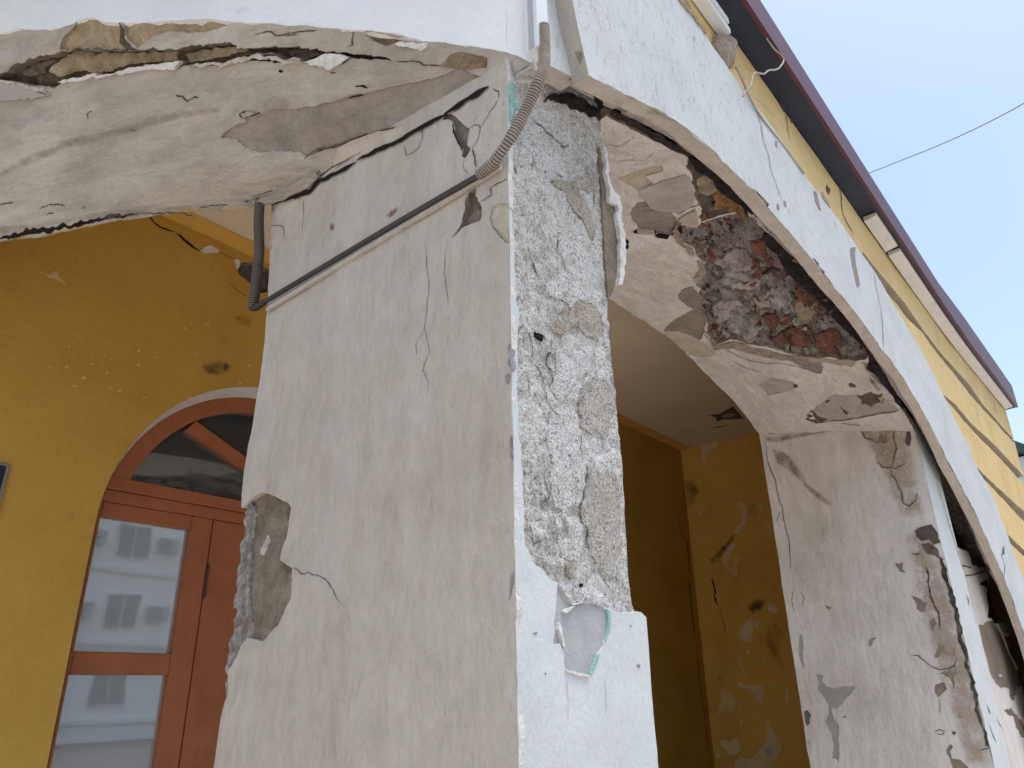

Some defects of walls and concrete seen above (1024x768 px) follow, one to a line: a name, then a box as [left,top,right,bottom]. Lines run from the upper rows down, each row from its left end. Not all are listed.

flaking render [59,20,227,51]
flaking render [363,32,429,51]
crack [0,86,489,259]
crack [416,242,448,384]
flaking render [505,66,869,691]
flaking render [806,383,917,507]
flaking render [225,493,271,700]
flaking render [895,524,941,631]
flaking render [938,471,988,585]
peeling [816,674,856,762]
flaking render [935,729,968,768]
flaking render [979,614,1024,738]